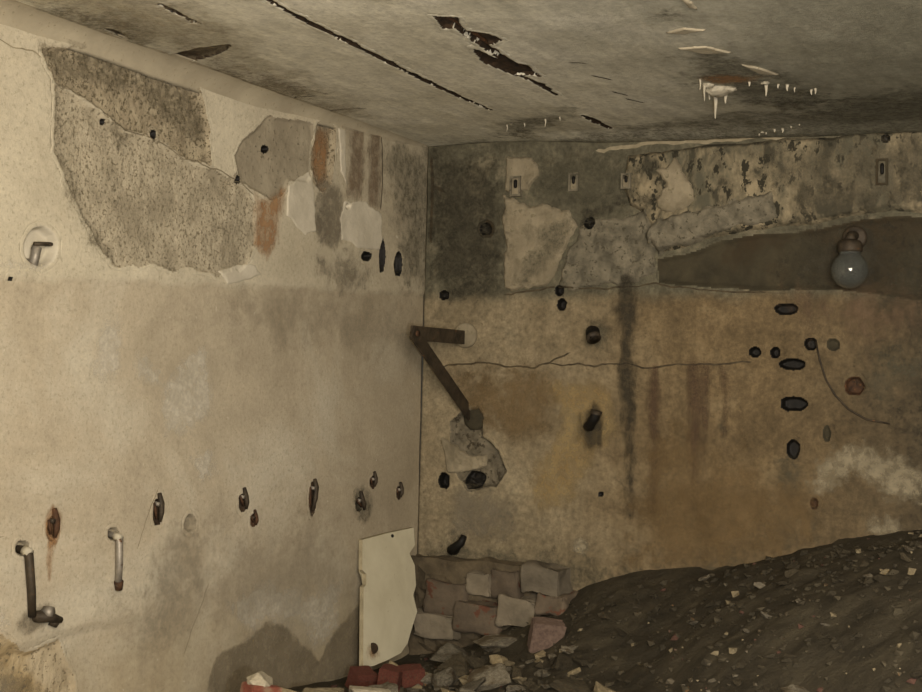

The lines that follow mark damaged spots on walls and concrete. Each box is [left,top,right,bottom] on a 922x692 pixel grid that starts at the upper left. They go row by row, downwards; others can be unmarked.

spalling [259,0,497,111]
spalling [426,14,563,96]
spalling [39,41,346,284]
spalling [577,114,617,129]
damp [572,55,922,213]
peeling [339,201,383,250]
peeling [502,131,922,304]
crack [444,352,751,369]
corrosion [46,507,60,565]
spalling [0,629,80,692]